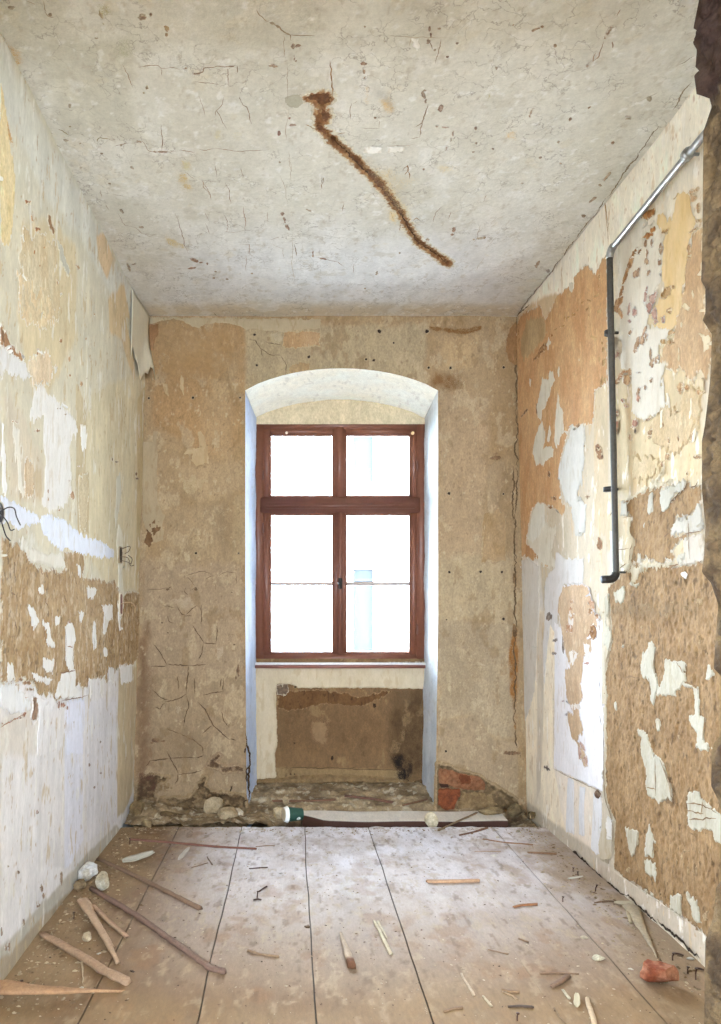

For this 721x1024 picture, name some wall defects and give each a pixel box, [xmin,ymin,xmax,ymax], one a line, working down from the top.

crack [97,9,494,278]
peeling [0,323,39,364]
peeling [513,545,538,583]
flaking render [546,187,721,937]
flaking render [0,535,140,725]
crack [146,571,251,802]
peeling [276,683,392,712]
corrosion [507,624,519,734]
flaking render [256,761,527,815]